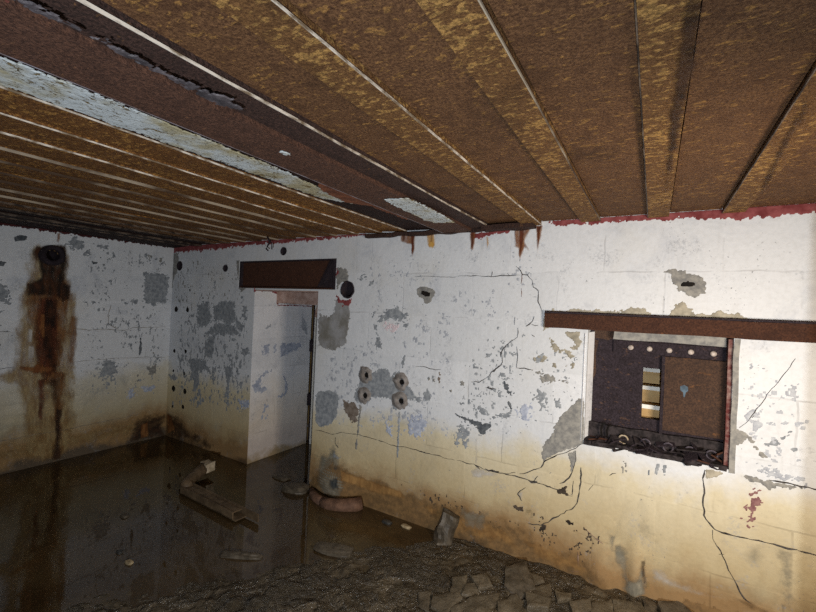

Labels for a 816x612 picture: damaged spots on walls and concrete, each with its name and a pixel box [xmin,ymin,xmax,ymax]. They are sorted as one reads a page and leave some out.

peeling [0,57,353,204]
corrosion [515,226,542,256]
peeling [0,279,12,313]
corrosion [1,234,77,460]
peeling [64,236,272,412]
peeling [261,317,308,357]
peeling [307,255,654,471]
spalling [663,269,749,322]
water stain [133,414,207,446]
crack [317,430,590,526]
water stain [626,570,644,597]
crack [702,471,816,603]